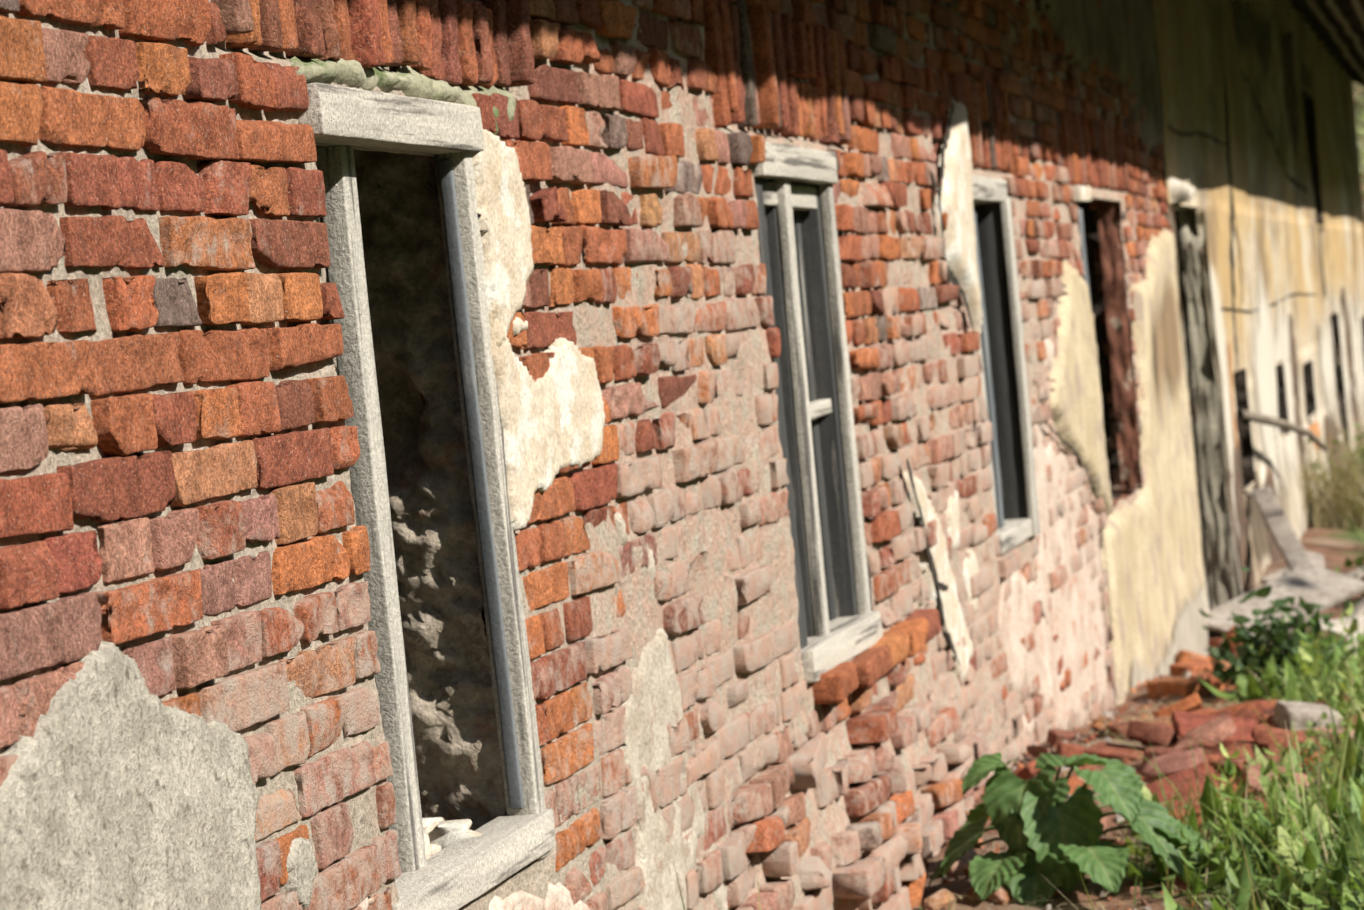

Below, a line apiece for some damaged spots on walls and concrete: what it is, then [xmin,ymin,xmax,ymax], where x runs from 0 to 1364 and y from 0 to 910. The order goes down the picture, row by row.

peeling [472,129,605,532]
peeling [936,97,983,354]
crack [1166,1,1317,364]
spalling [806,470,979,738]
peeling [999,228,1206,738]
peeling [0,641,261,910]
peeling [284,837,317,909]
peeling [357,896,374,910]
spalling [422,817,483,860]
spalling [555,807,607,910]